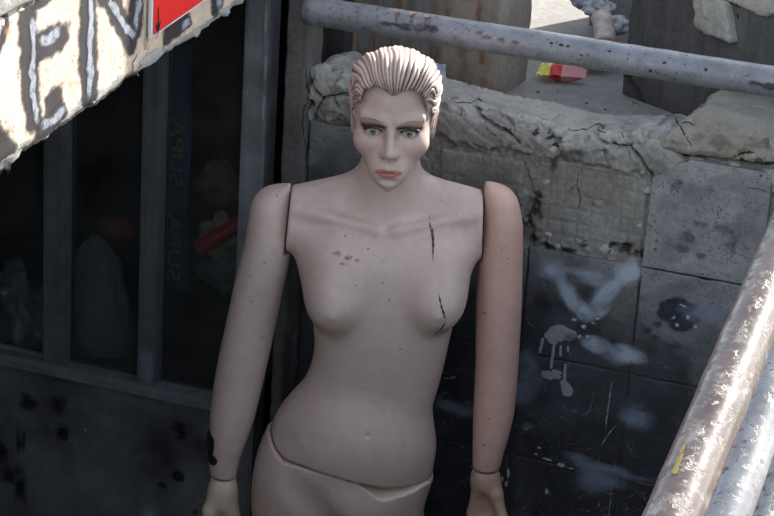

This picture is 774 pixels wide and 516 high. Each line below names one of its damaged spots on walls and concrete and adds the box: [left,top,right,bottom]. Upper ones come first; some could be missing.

spalling [532,129,569,154]
crack [672,110,694,147]
spalling [522,179,588,253]
spalling [599,241,643,263]